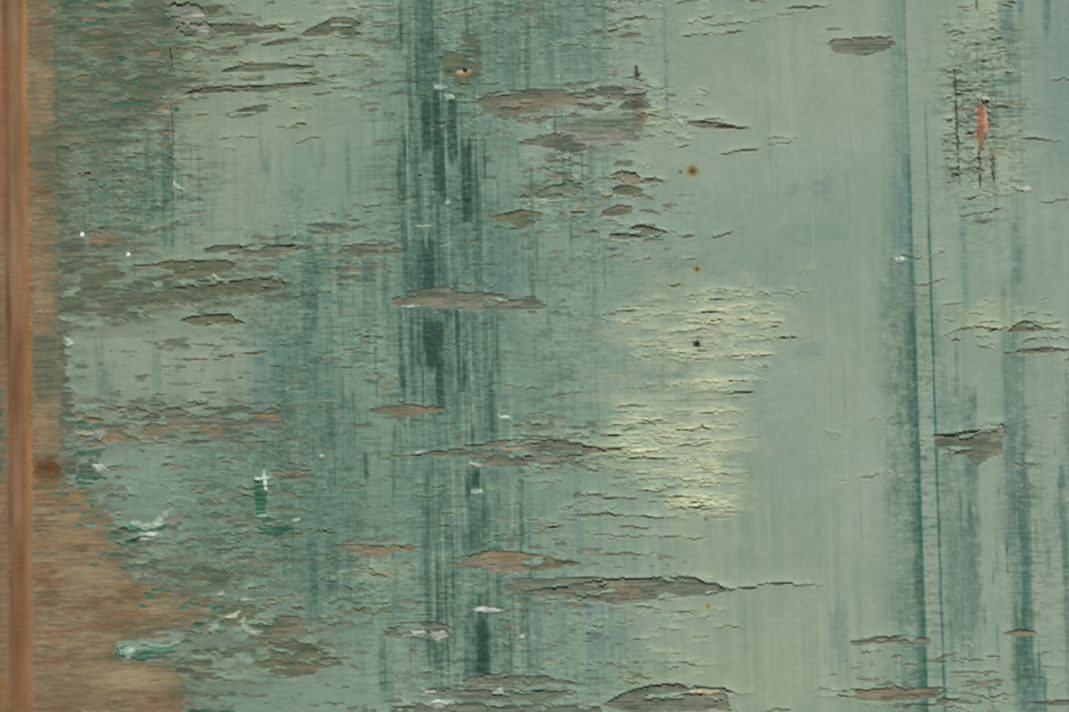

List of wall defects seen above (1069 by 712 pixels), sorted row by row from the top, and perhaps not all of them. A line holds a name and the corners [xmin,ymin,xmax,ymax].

peeling [827,35,897,57]
peeling [436,33,654,154]
peeling [390,285,549,312]
peeling [26,0,405,712]
peeling [368,402,447,418]
peeling [0,222,11,712]
peeling [935,420,1007,469]
peeling [449,550,725,606]
peeling [384,621,454,645]
peeling [390,670,732,712]